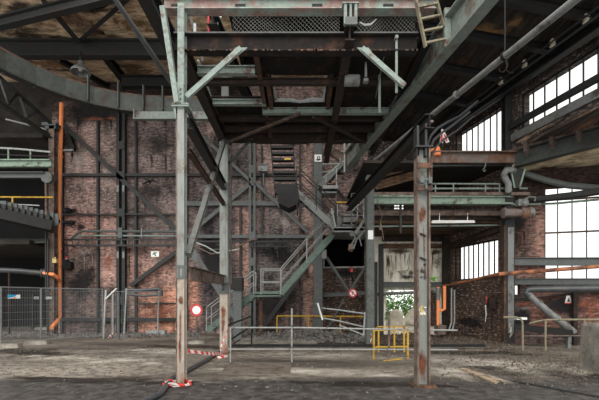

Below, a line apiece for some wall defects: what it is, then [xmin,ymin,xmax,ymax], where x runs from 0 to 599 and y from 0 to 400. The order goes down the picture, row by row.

leakage [386,249,409,275]